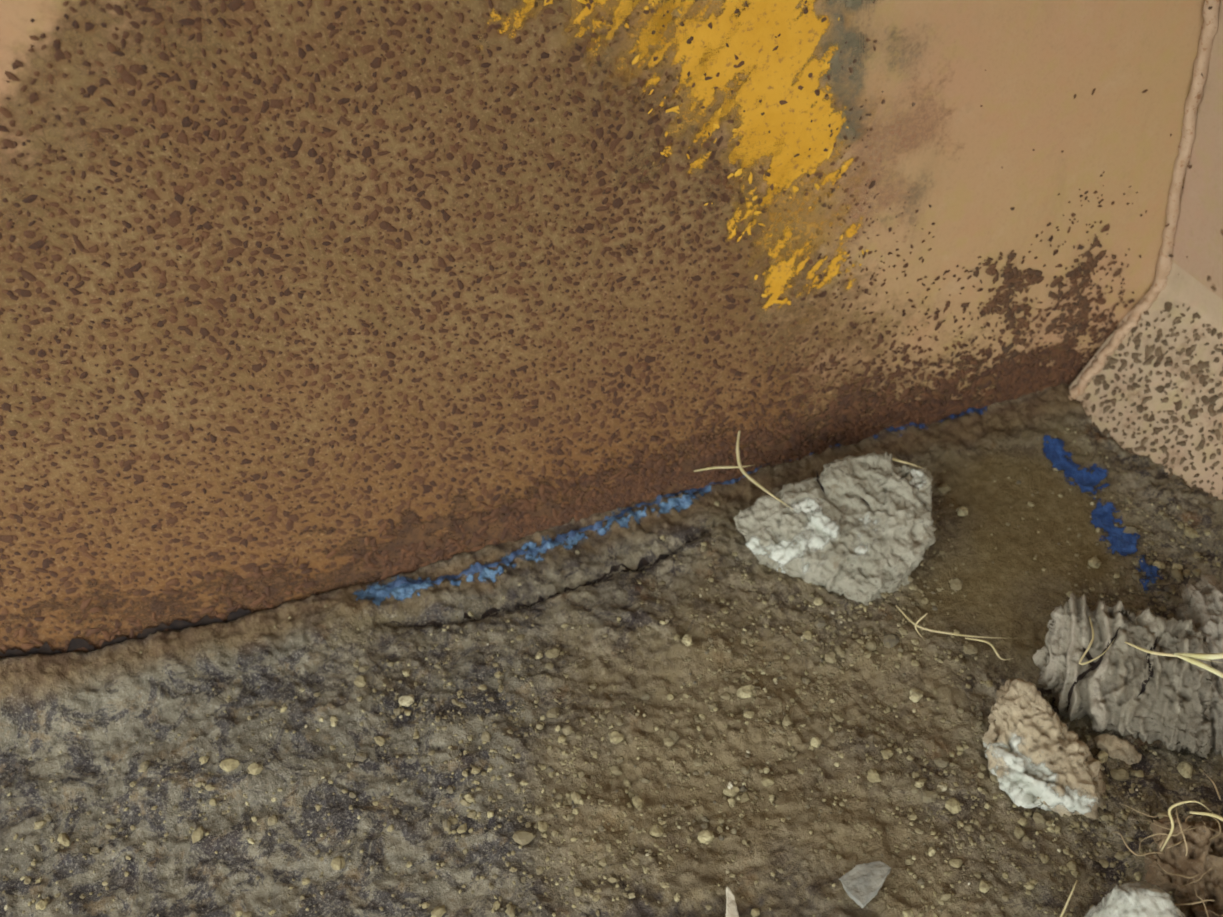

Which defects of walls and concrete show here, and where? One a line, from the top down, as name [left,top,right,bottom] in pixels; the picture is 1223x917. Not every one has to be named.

peeling [487,0,553,38]
peeling [573,0,869,311]
leakage [668,0,936,267]
crack [380,526,713,628]